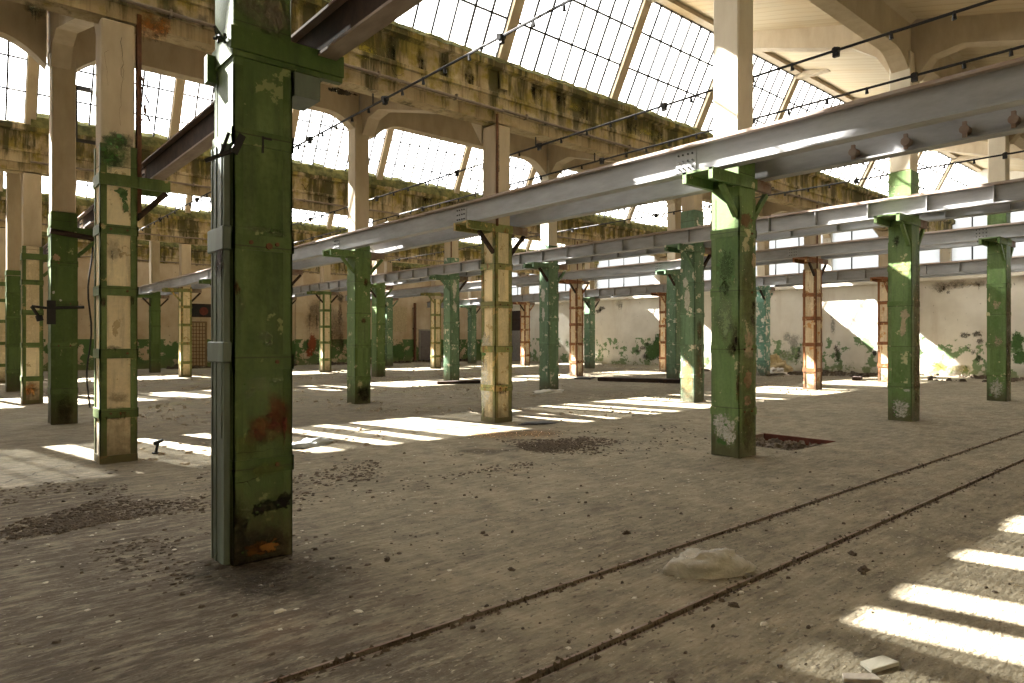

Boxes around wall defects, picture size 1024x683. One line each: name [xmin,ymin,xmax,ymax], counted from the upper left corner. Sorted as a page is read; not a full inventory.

peeling [635,331,659,364]
peeling [959,330,1024,364]
peeling [892,389,910,418]
peeling [713,414,736,445]